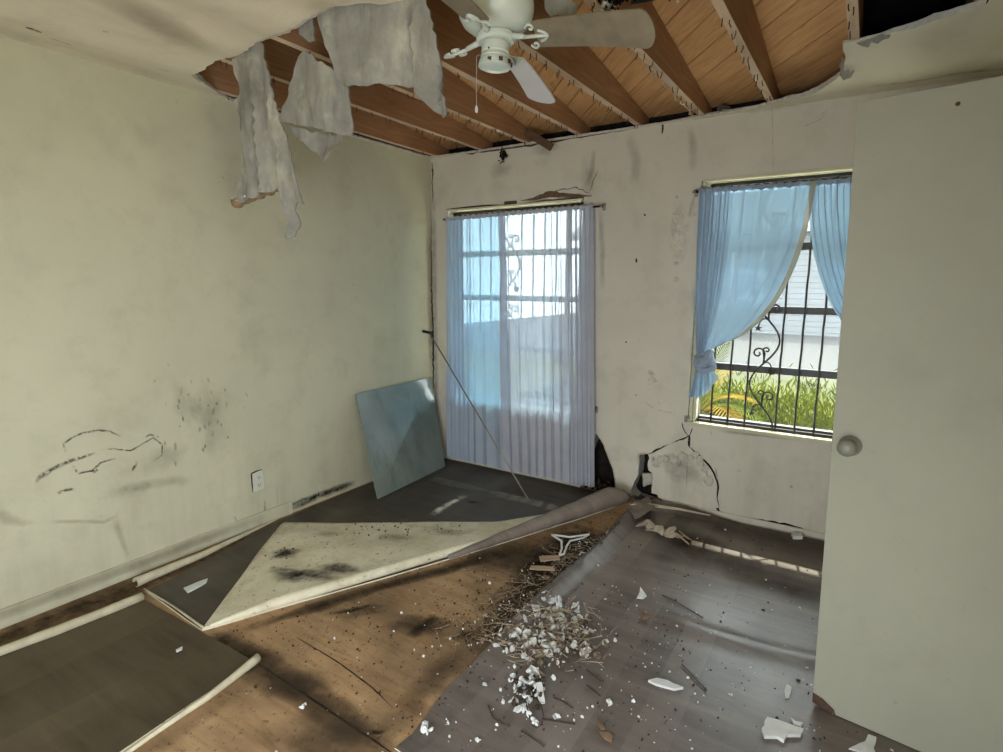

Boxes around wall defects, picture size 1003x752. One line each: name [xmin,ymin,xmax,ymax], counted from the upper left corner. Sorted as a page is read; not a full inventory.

spalling [446,174,597,210]
spalling [585,436,616,490]
crack [649,423,722,512]
crack [755,518,803,529]